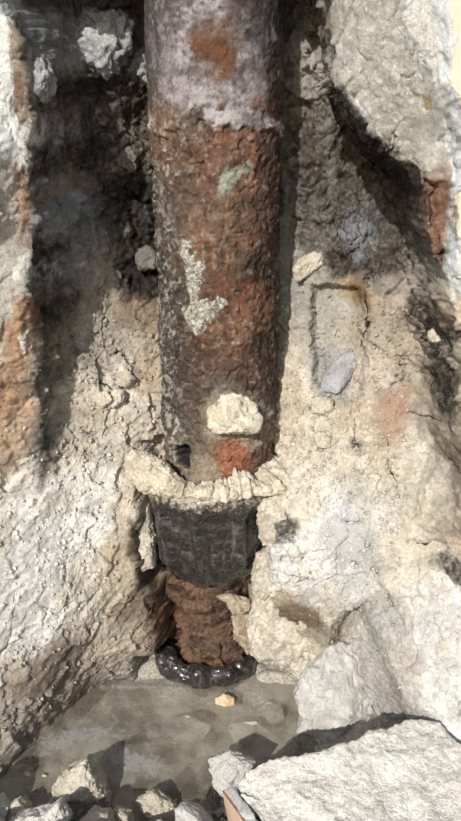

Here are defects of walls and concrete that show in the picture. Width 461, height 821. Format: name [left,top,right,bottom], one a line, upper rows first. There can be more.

spalling [0,167,34,321]
spalling [0,0,52,157]
damp [24,70,158,375]
damp [290,92,442,277]
spalling [335,0,461,296]
corrosion [0,309,28,418]
damp [401,296,461,416]
damp [34,388,58,487]
corrosion [215,436,250,478]
spalling [0,514,74,639]
spalling [430,569,456,592]
spalling [399,583,461,722]